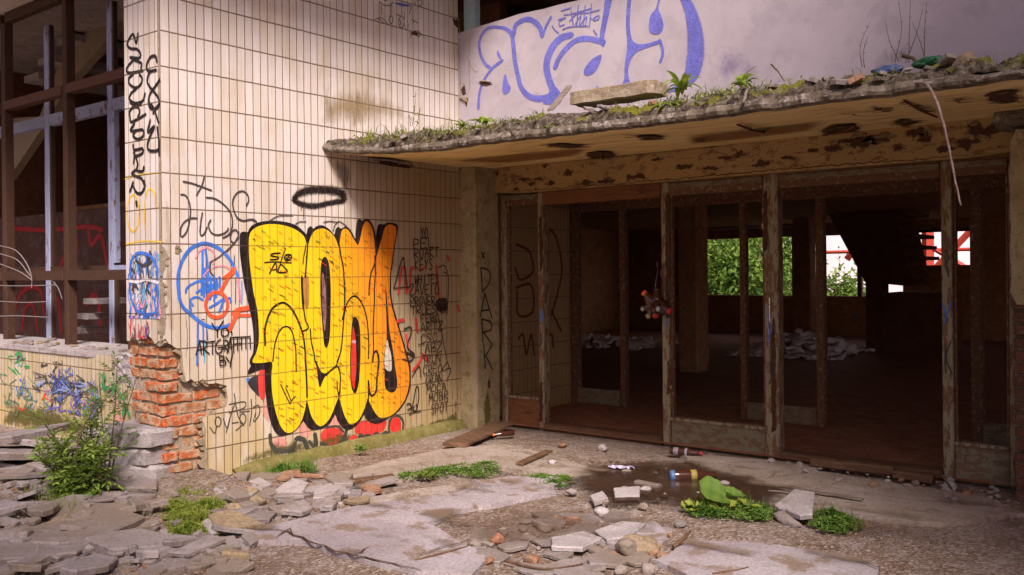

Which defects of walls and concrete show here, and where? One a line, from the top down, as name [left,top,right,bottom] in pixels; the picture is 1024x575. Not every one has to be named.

damp [331,99,384,118]
damp [690,125,816,144]
spalling [115,245,226,474]